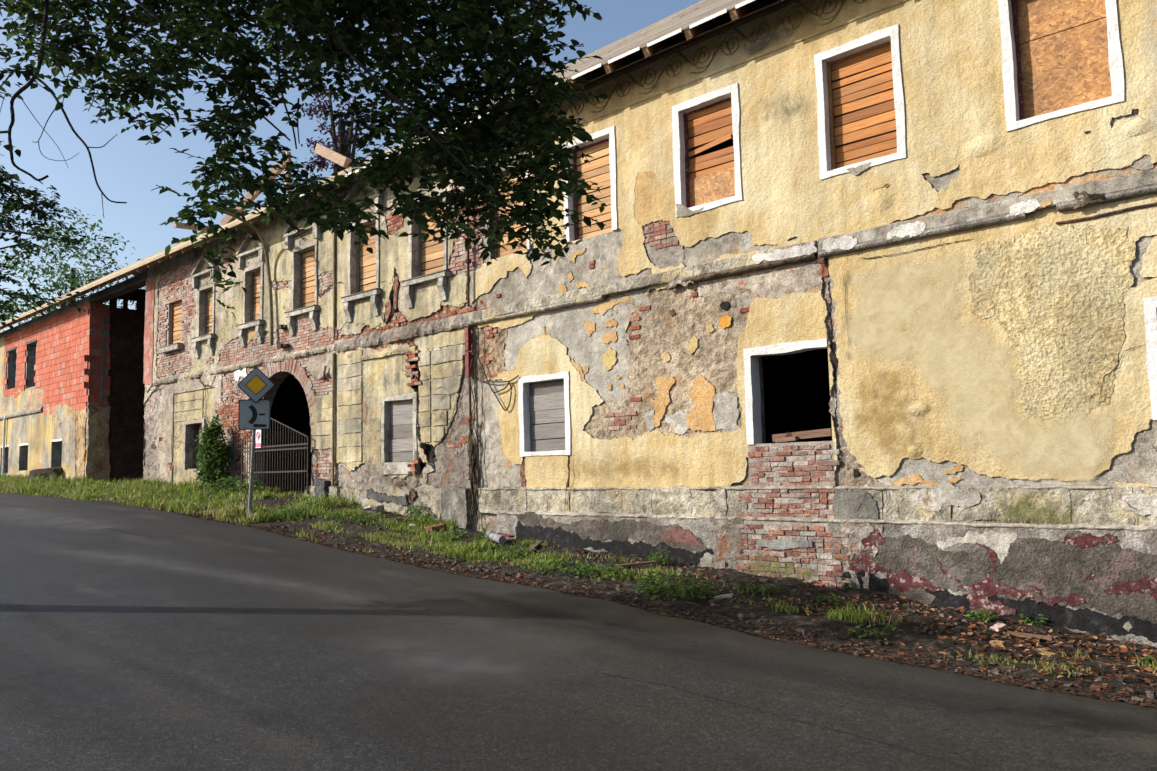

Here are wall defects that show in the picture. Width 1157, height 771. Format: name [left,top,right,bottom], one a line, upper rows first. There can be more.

spalling [847,162,871,176]
peeling [887,154,1157,239]
spalling [1130,235,1157,288]
crack [385,276,402,323]
peeling [207,122,858,501]
flaking render [143,248,199,481]
crack [822,239,970,469]
peeling [836,419,1157,486]
peeling [848,528,1086,616]
peeling [1062,531,1118,548]
peeling [1103,575,1157,600]